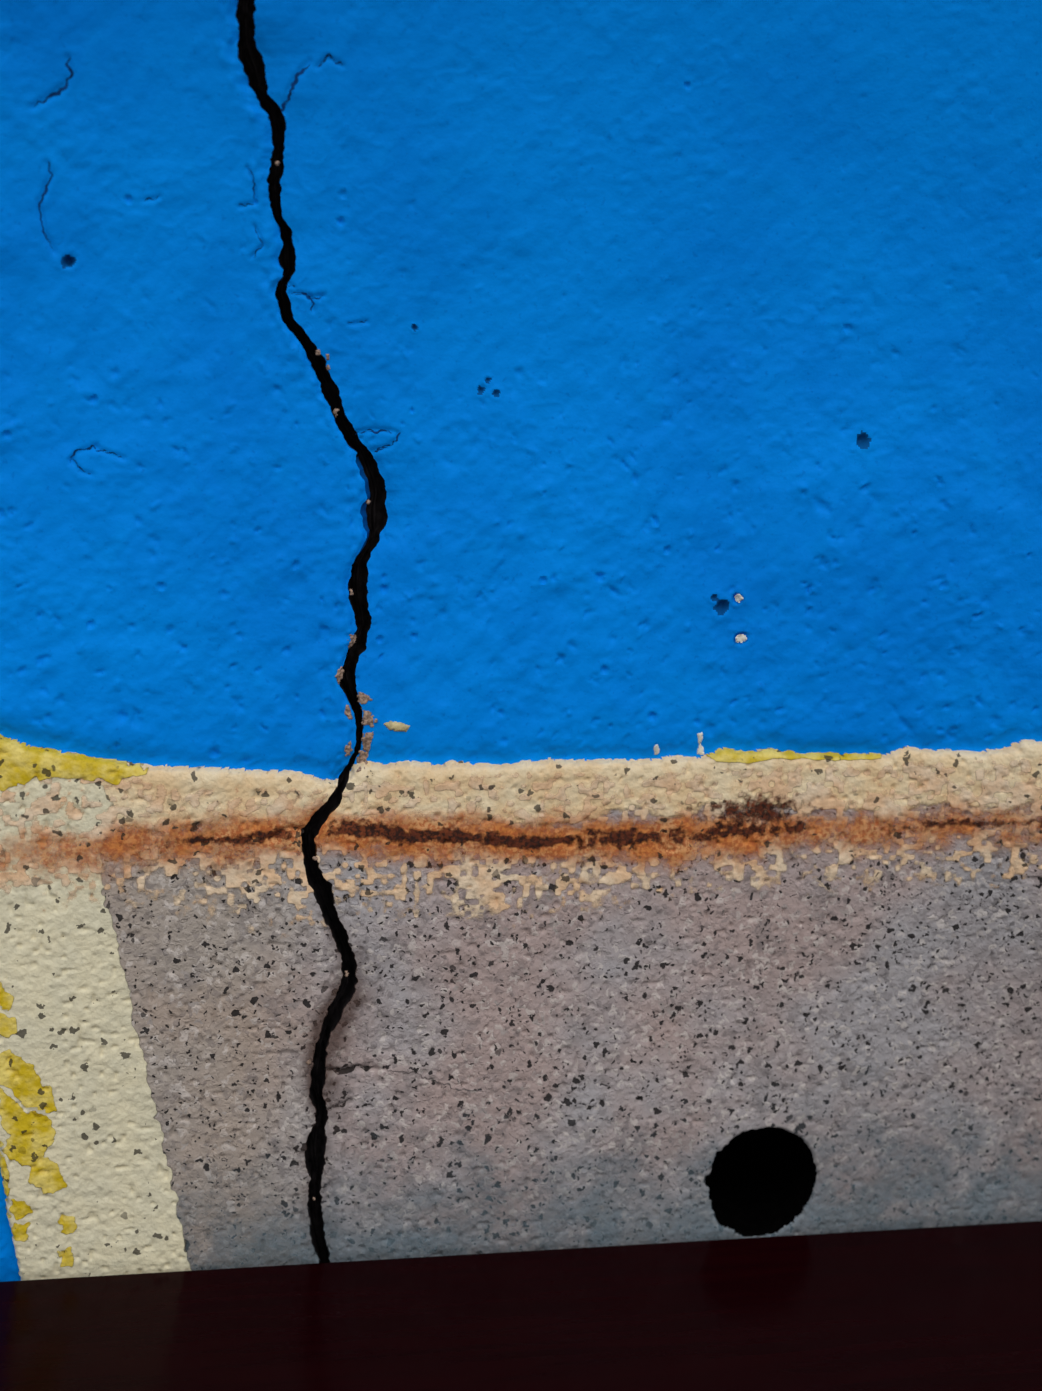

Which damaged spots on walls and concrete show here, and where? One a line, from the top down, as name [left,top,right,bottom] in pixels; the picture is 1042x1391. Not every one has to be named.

crack [235,0,485,1263]
peeling [384,721,410,732]
peeling [0,732,1042,1281]
corrosion [17,793,1042,868]